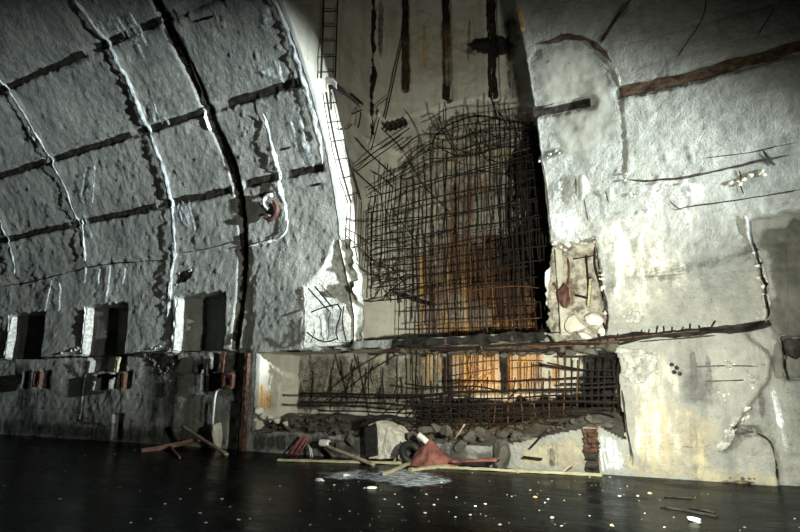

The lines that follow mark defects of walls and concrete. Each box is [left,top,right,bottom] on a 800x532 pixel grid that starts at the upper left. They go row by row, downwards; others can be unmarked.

crack [676,0,707,58]
crack [629,143,800,210]
crack [2,241,235,287]
spalling [299,46,716,431]
corrosion [391,237,549,390]
crack [757,433,778,479]